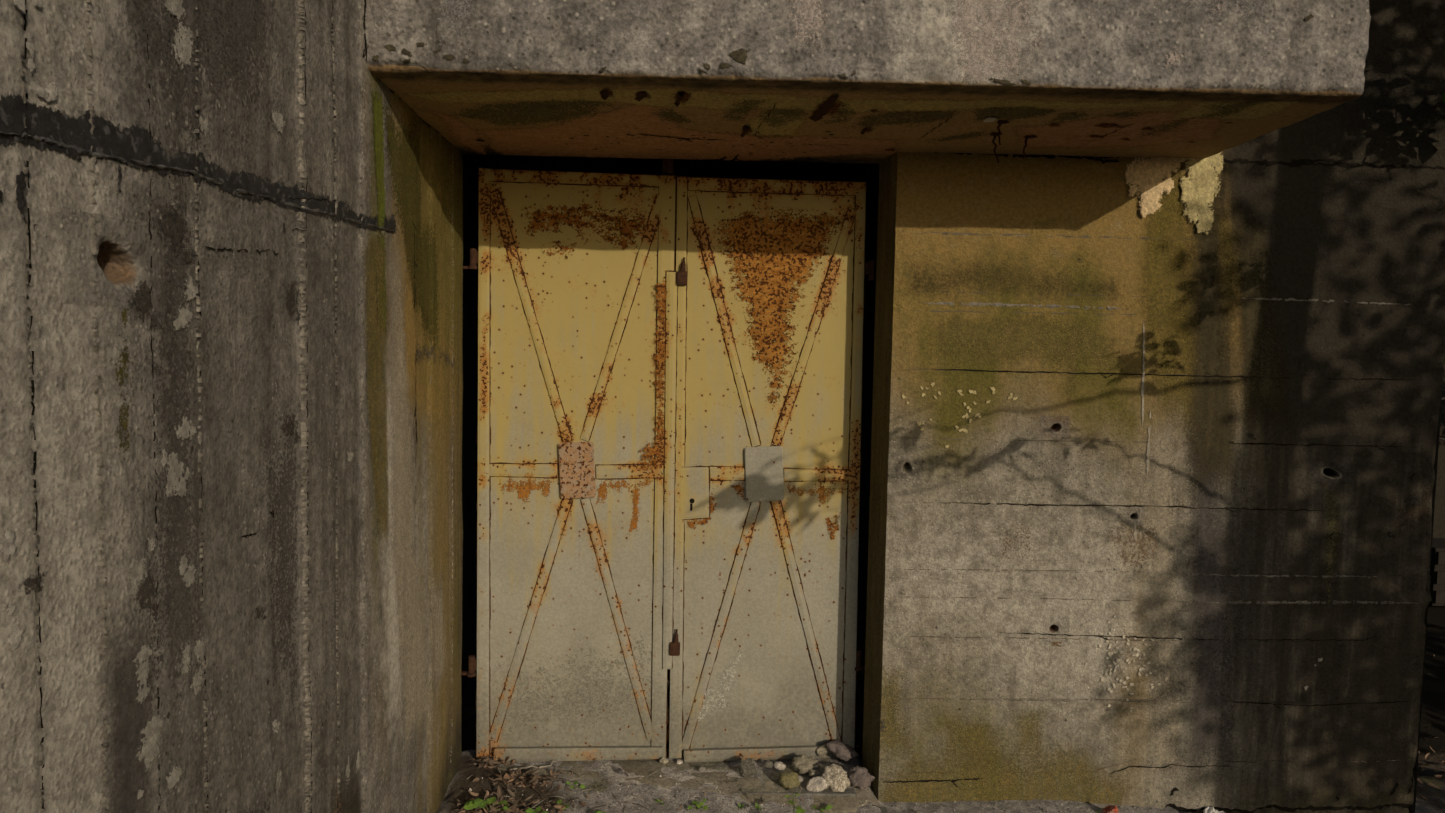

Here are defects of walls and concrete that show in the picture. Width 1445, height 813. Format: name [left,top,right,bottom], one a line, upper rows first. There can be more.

water stain [114,0,279,163]
water stain [19,573,44,595]
spalling [63,207,163,312]
water stain [107,178,200,813]
water stain [255,380,316,709]
water stain [379,220,455,740]
rust [499,478,550,502]
rust [521,196,650,263]
rust [596,277,666,532]
rust [713,205,846,414]
rust [787,482,845,540]
water stain [421,98,1299,772]